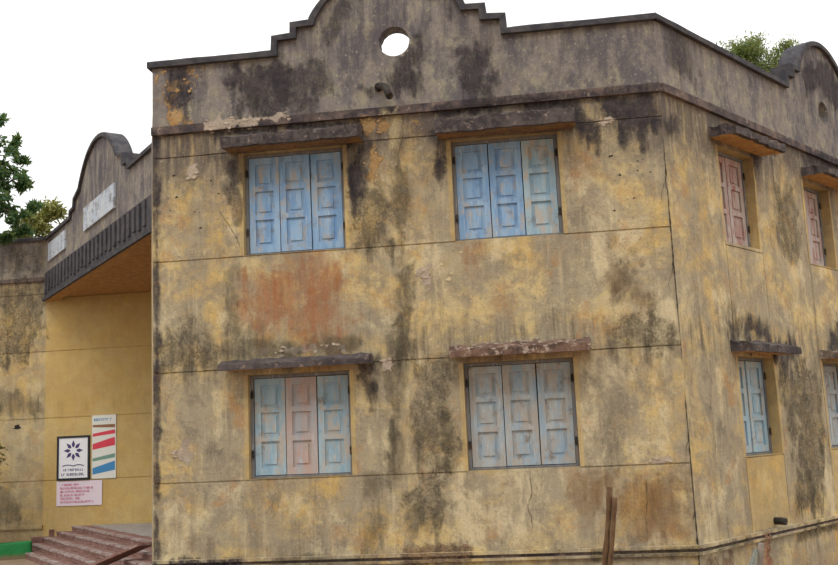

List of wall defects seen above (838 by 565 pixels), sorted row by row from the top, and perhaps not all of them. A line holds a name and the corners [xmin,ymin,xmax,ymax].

peeling [154,65,204,127]
spalling [203,110,291,133]
water stain [346,142,373,211]
water stain [430,131,445,173]
water stain [437,42,600,155]
water stain [596,83,661,153]
crack [661,138,683,367]
water stain [0,276,44,367]
water stain [829,323,838,351]